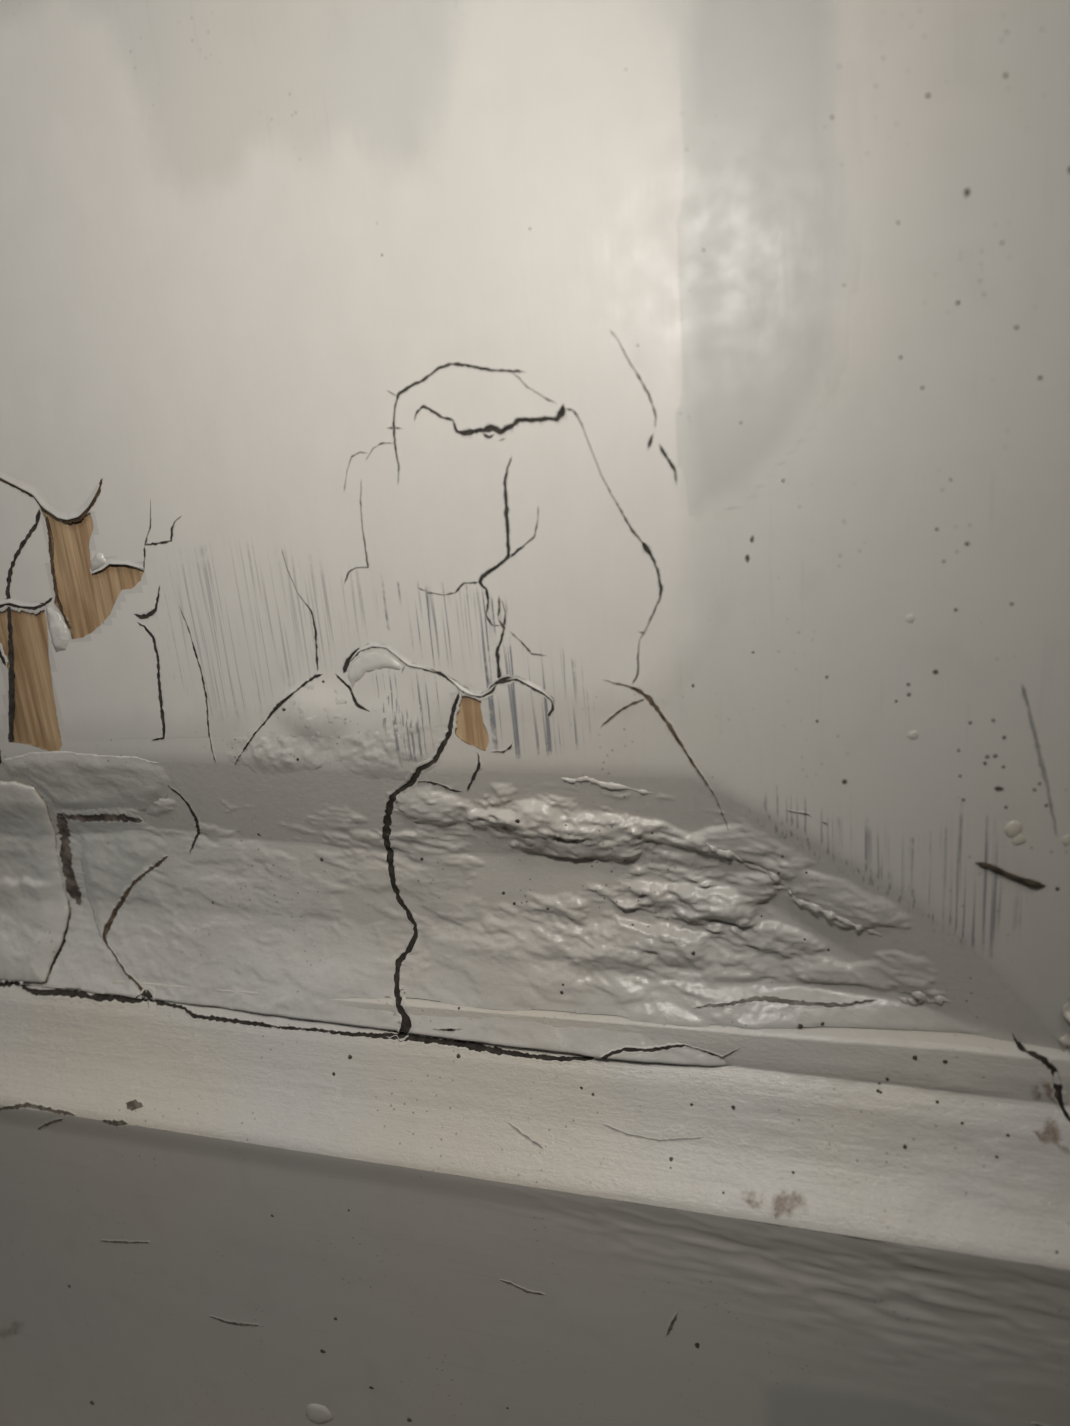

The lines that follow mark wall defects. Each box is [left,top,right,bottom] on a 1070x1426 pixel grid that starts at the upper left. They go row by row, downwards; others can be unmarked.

crack [610,330,678,486]
peeling [0,470,171,983]
crack [0,361,741,1065]
peeling [350,641,553,751]
crack [693,993,878,1010]
crack [1012,1032,1070,1124]